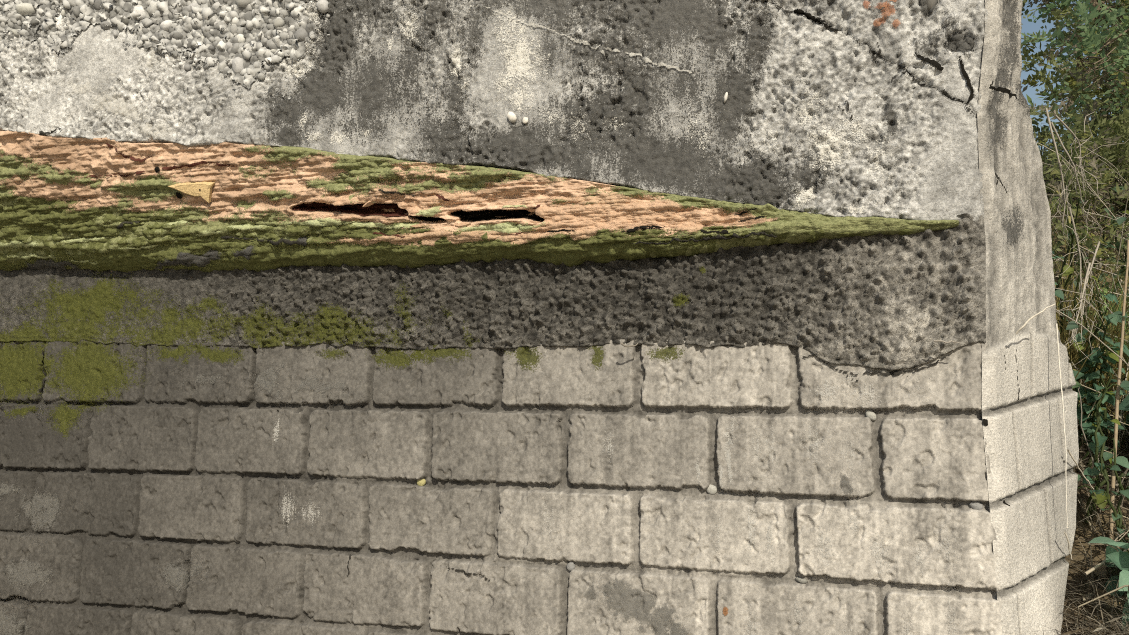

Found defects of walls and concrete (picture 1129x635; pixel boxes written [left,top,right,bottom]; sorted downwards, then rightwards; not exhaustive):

rust [863,0,901,29]
crack [752,0,1017,117]
damp [254,0,901,212]
damp [0,241,97,271]
damp [154,224,269,270]
damp [289,205,441,246]
damp [580,578,690,635]